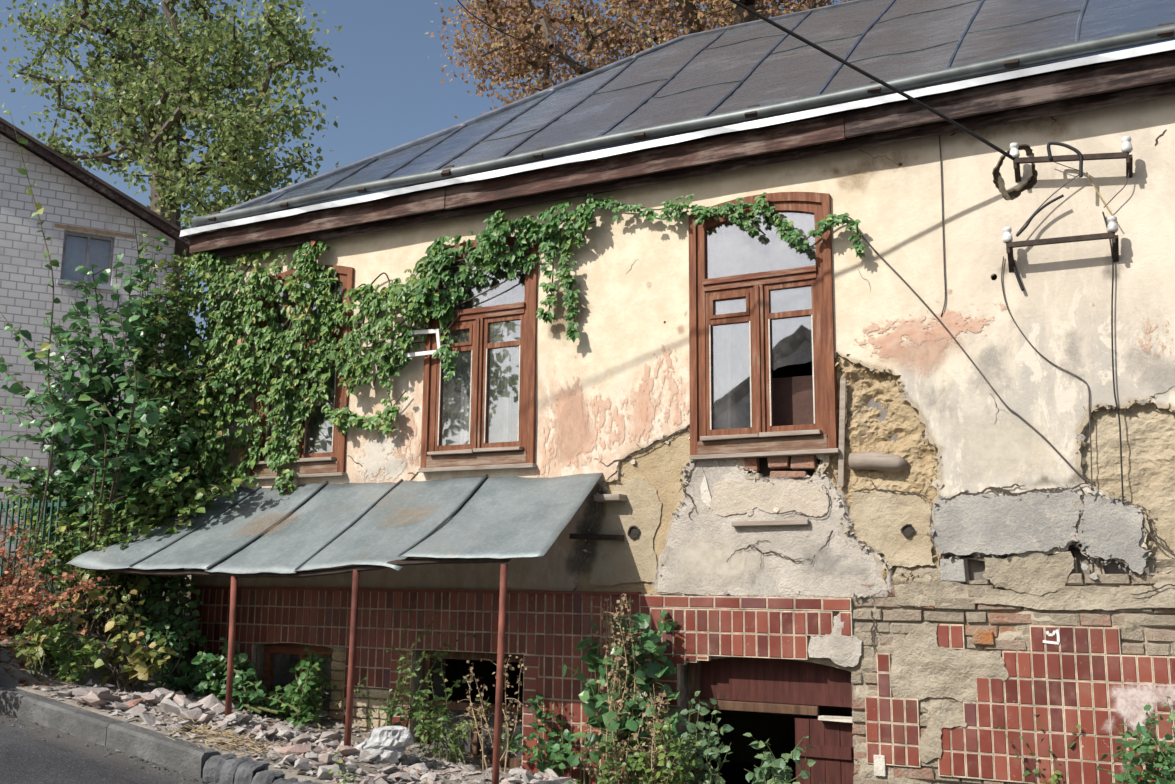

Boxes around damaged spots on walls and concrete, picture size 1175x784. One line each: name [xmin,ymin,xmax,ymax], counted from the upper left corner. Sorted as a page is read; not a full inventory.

crack [595,424,690,482]
spalling [534,303,1012,601]
crack [678,461,697,520]
spalling [1070,396,1175,580]
flaking render [972,630,995,645]